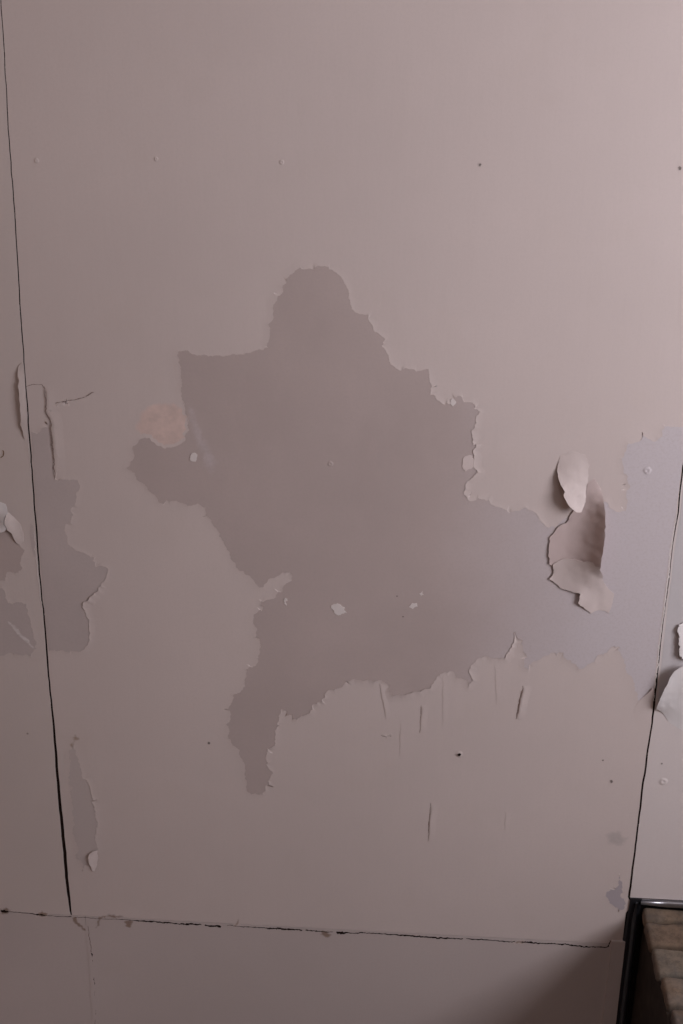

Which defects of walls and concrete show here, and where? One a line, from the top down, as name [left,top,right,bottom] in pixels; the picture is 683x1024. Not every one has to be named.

peeling [18,362,27,439]
peeling [0,502,36,585]
peeling [121,260,683,799]
crack [117,919,611,948]